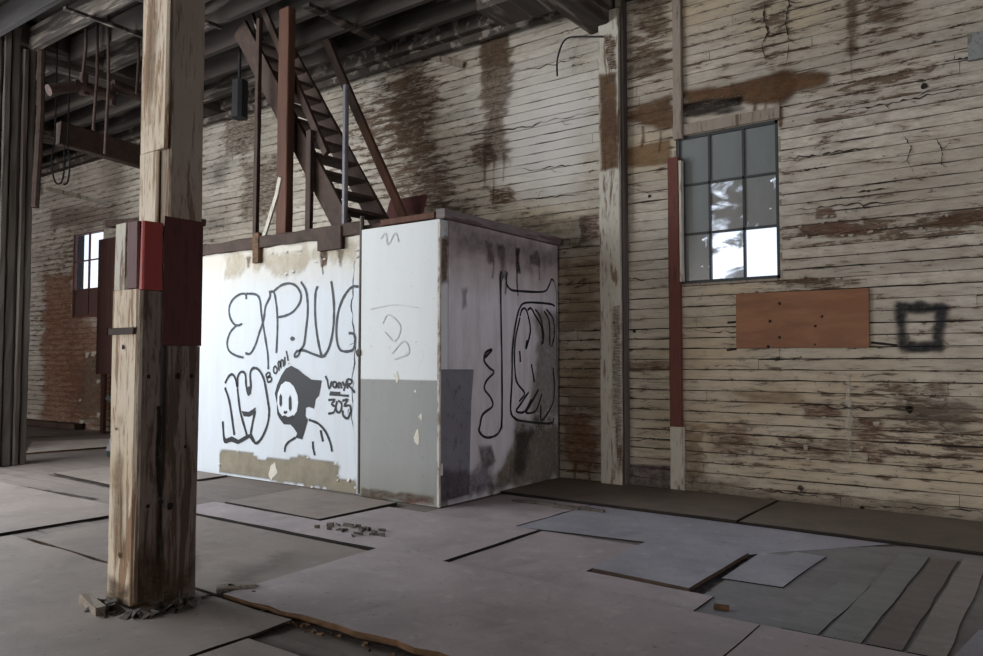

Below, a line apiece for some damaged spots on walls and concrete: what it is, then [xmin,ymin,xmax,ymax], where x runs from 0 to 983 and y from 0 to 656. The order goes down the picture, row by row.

crack [755,0,801,65]
water stain [471,35,513,180]
peeling [218,450,356,494]